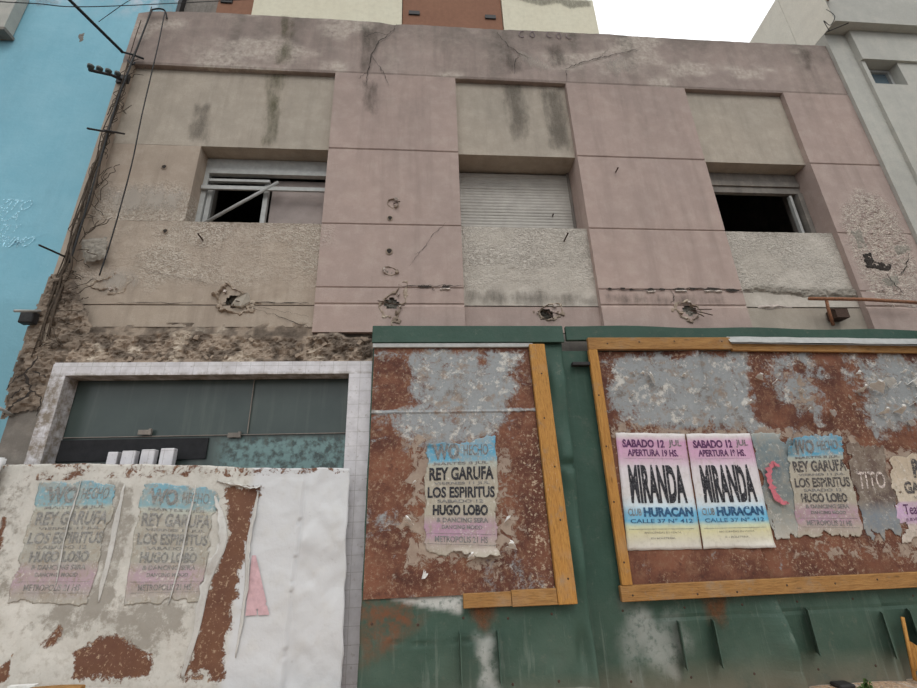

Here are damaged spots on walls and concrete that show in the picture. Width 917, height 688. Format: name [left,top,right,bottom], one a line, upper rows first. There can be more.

crack [360,26,395,82]
peeling [743,196,917,310]
spalling [378,266,408,326]
hole [533,303,565,321]
spalling [671,299,713,324]
spalling [0,272,373,419]